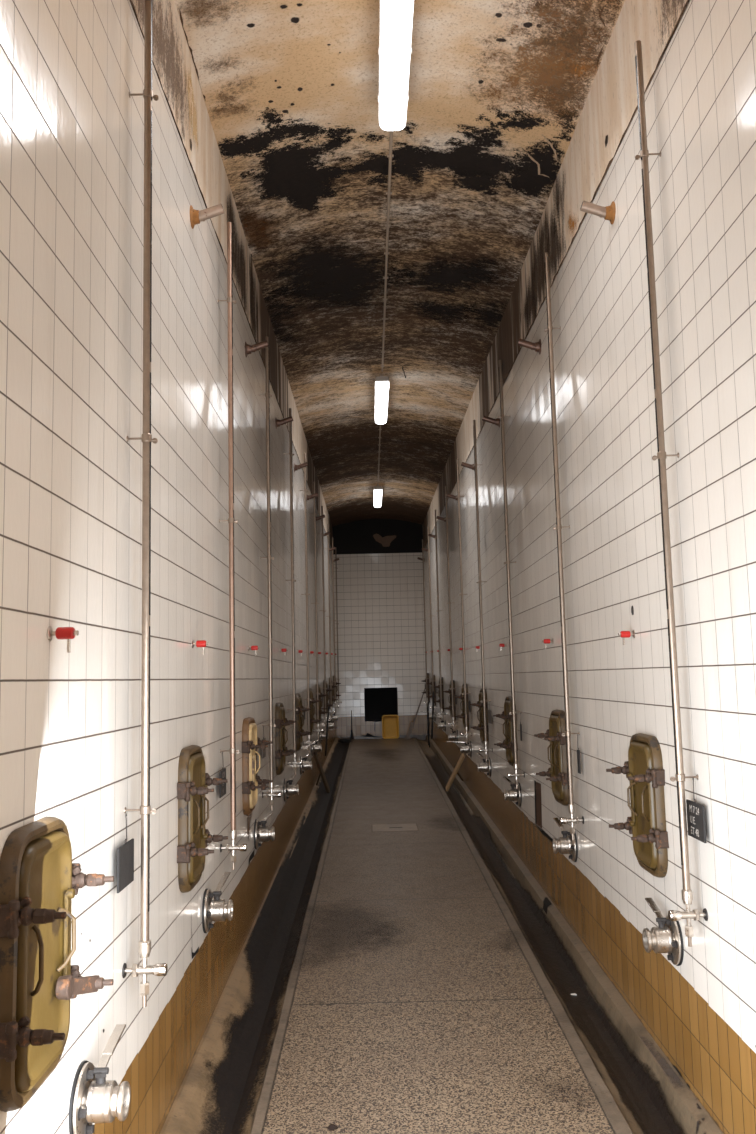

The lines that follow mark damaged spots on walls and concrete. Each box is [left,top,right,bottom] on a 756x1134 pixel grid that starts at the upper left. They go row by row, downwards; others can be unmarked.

water stain [130,0,235,138]
water stain [656,0,690,41]
water stain [213,0,620,347]